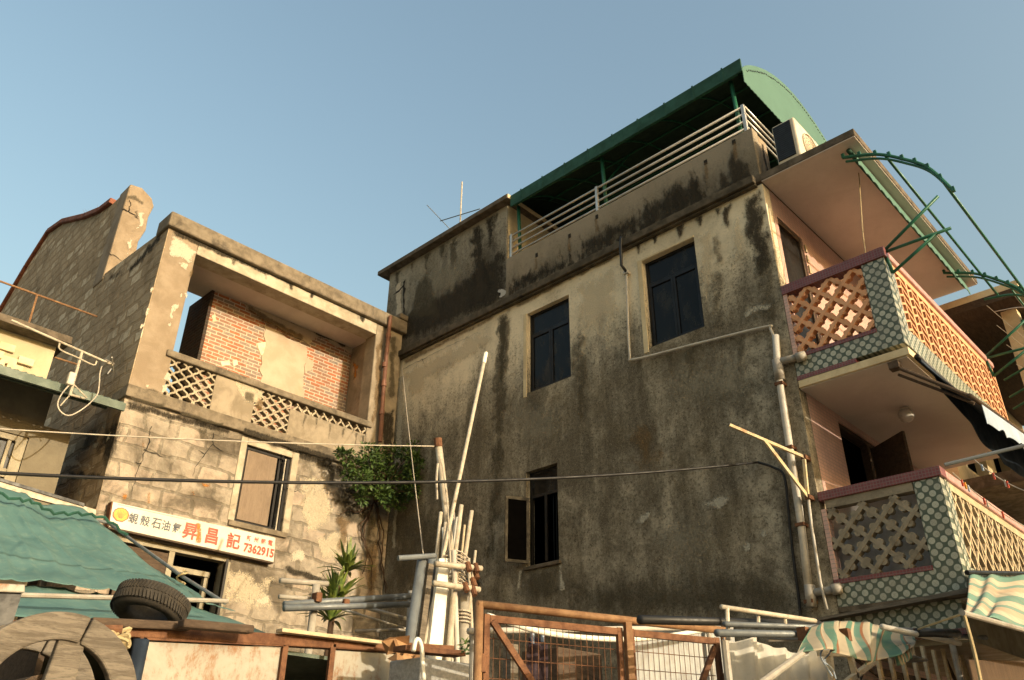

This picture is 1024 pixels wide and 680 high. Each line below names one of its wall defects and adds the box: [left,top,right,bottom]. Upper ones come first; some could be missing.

flaking render [169,234,197,276]
damp [744,191,775,318]
flaking render [236,301,352,409]
damp [372,151,751,591]